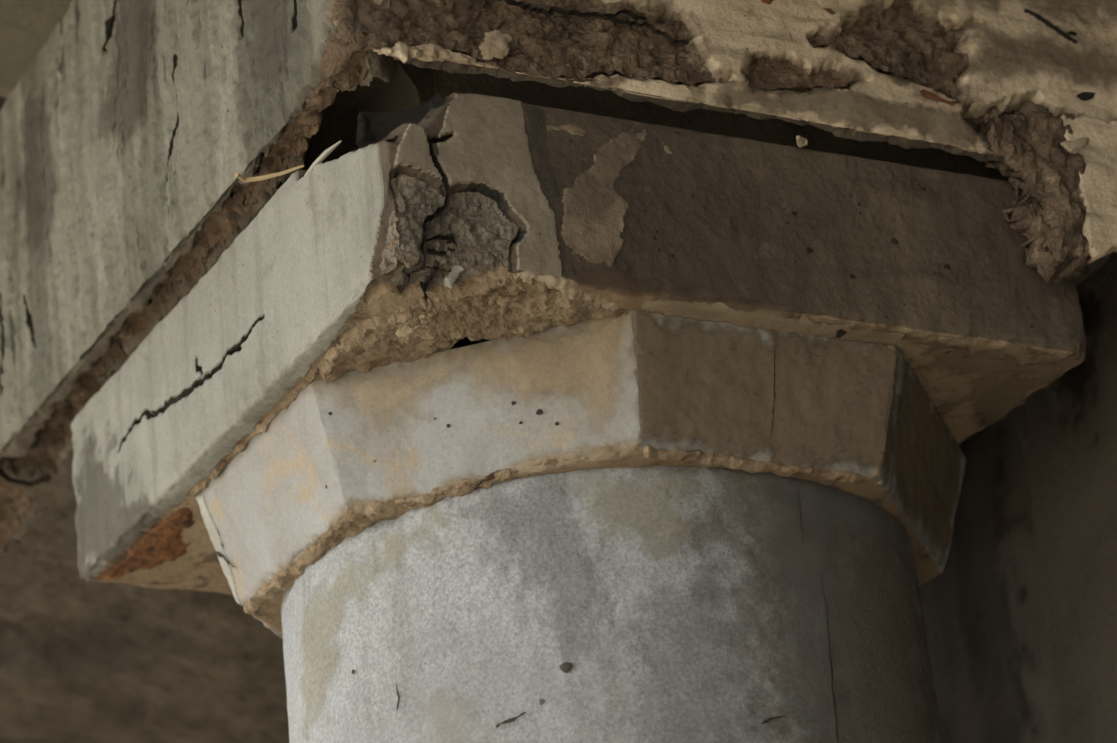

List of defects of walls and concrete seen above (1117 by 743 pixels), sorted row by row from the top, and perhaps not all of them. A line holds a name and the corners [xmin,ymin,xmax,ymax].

crack [102,0,117,52]
crack [166,54,179,181]
flaking render [808,5,968,97]
crack [1024,9,1078,44]
spalling [1076,92,1095,101]
flaking render [0,0,715,468]
crack [399,134,454,300]
flaking render [966,101,1092,286]
crack [0,293,36,394]
crack [119,316,265,452]
rust [97,271,905,580]
peeling [195,495,245,608]